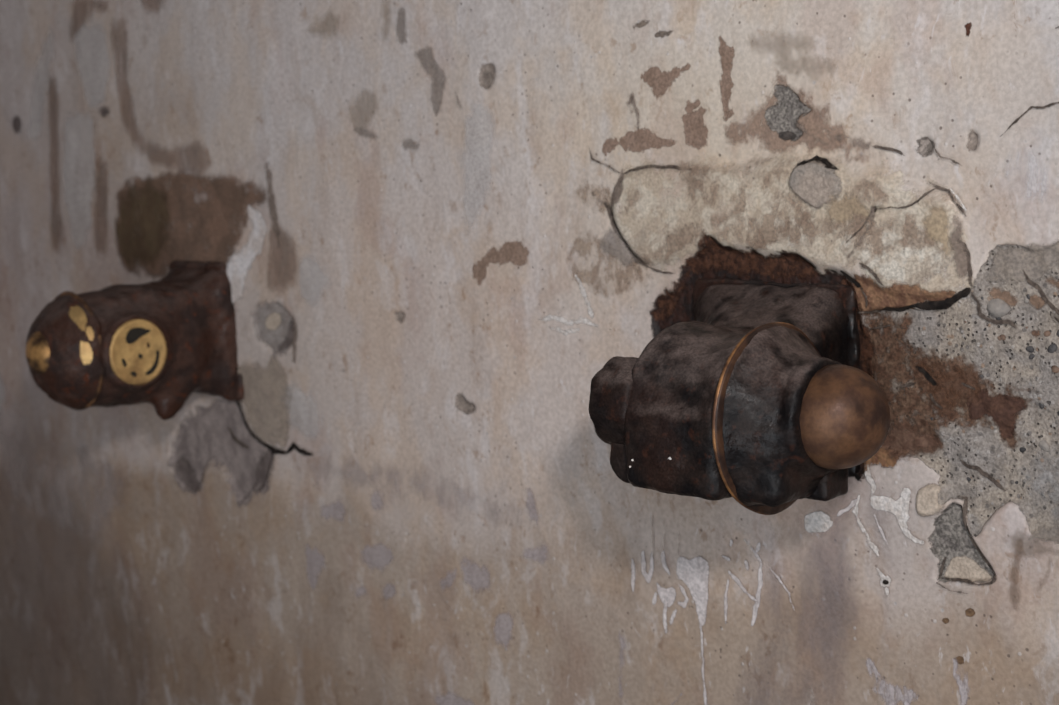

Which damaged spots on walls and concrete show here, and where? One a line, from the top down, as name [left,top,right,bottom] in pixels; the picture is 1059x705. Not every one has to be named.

peeling [602,100,708,156]
peeling [641,64,690,98]
peeling [719,36,851,159]
crack [797,135,903,170]
crack [1000,102,1059,137]
crack [590,153,709,274]
crack [840,182,1017,329]
spalling [168,301,294,506]
rust [650,234,1028,478]
crack [901,366,942,408]
spalling [864,242,1059,583]